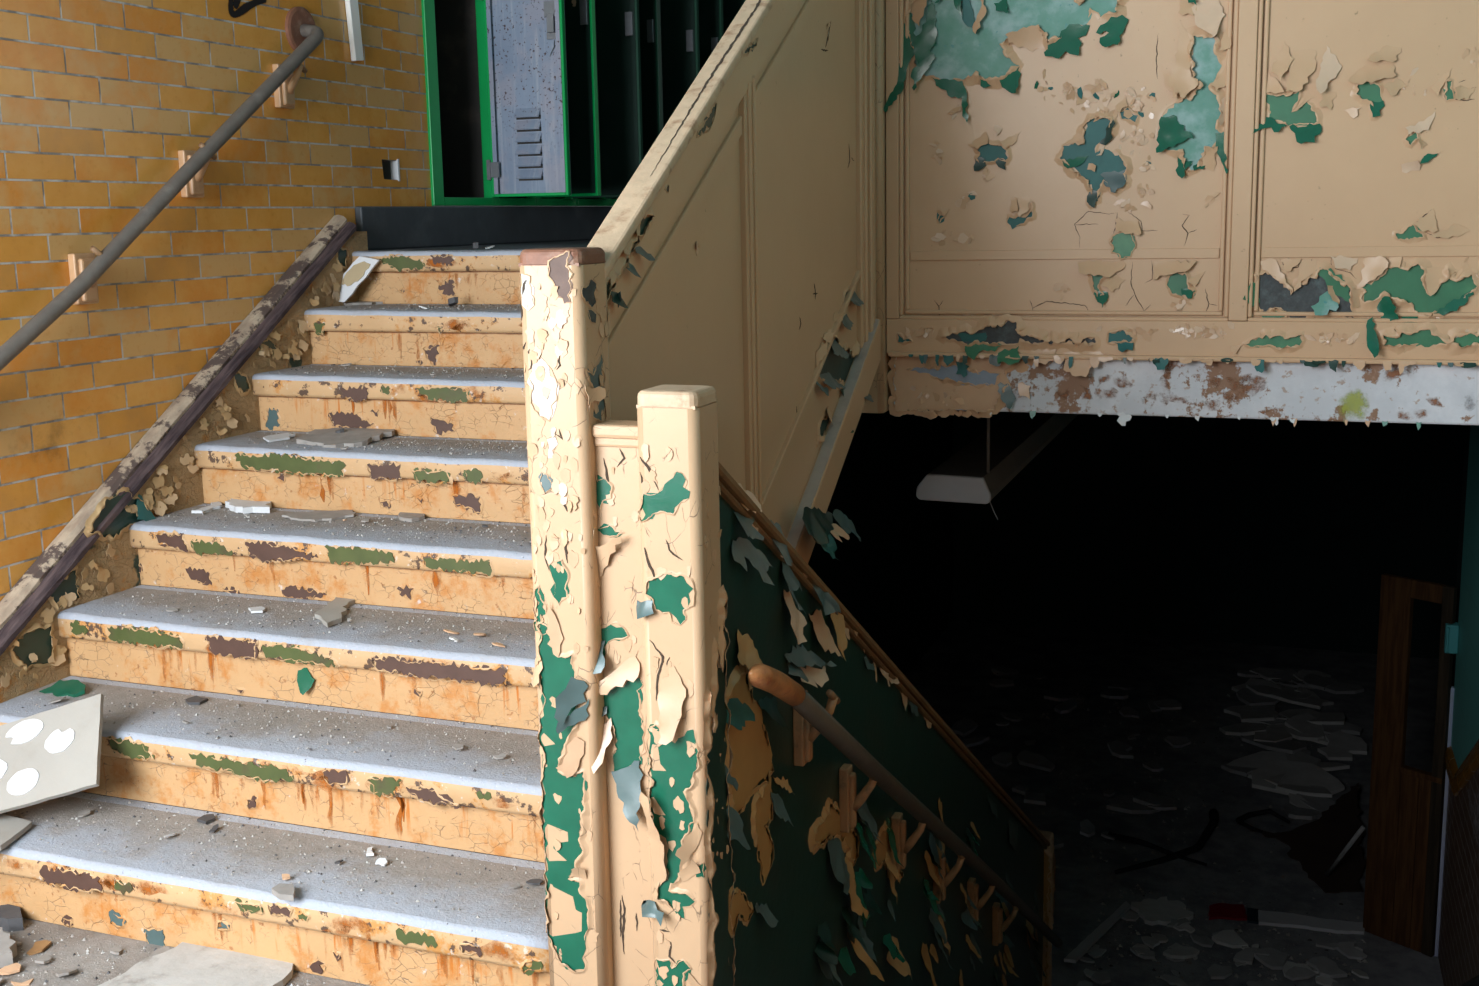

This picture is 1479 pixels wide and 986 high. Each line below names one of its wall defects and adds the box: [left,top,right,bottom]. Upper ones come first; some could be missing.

peeling [884,0,1129,122]
peeling [1054,0,1234,210]
peeling [864,207,1479,420]
damp [1057,375,1132,399]
damp [1205,375,1265,409]
damp [1341,392,1366,416]
peeling [0,247,484,695]
peeling [519,206,904,986]
peeling [370,655,509,698]
rust [141,883,164,895]
rust [325,920,387,960]
rust [472,944,509,983]